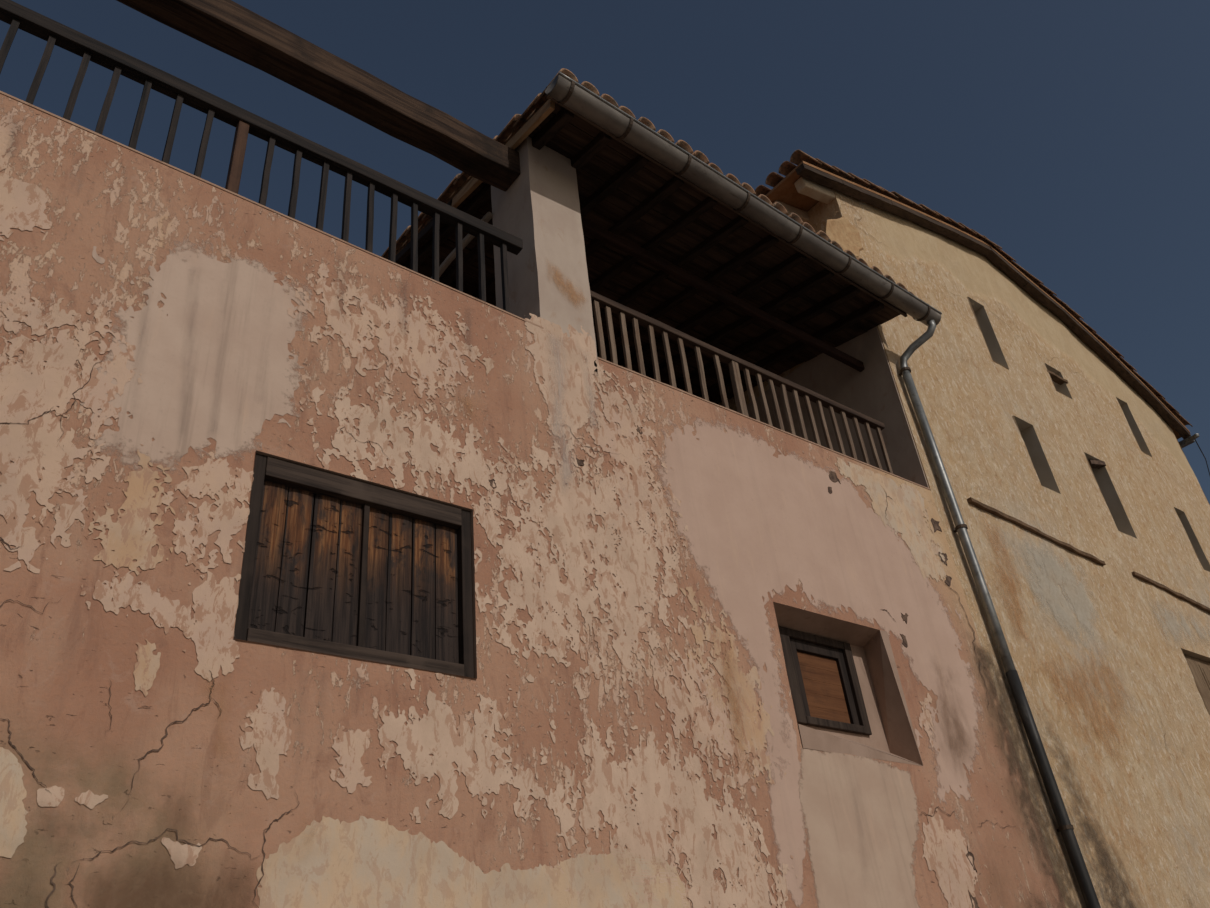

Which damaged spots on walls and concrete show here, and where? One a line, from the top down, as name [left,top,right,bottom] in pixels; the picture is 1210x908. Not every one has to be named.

peeling [0,159,52,241]
flaking render [826,216,871,268]
peeling [0,294,254,697]
peeling [256,247,797,908]
peeling [827,455,952,587]
crack [2,719,51,793]
peeling [0,747,108,858]
crack [123,670,222,808]
crack [45,792,300,908]
peeling [161,837,202,869]
peeling [240,687,292,800]
peeling [915,808,982,908]